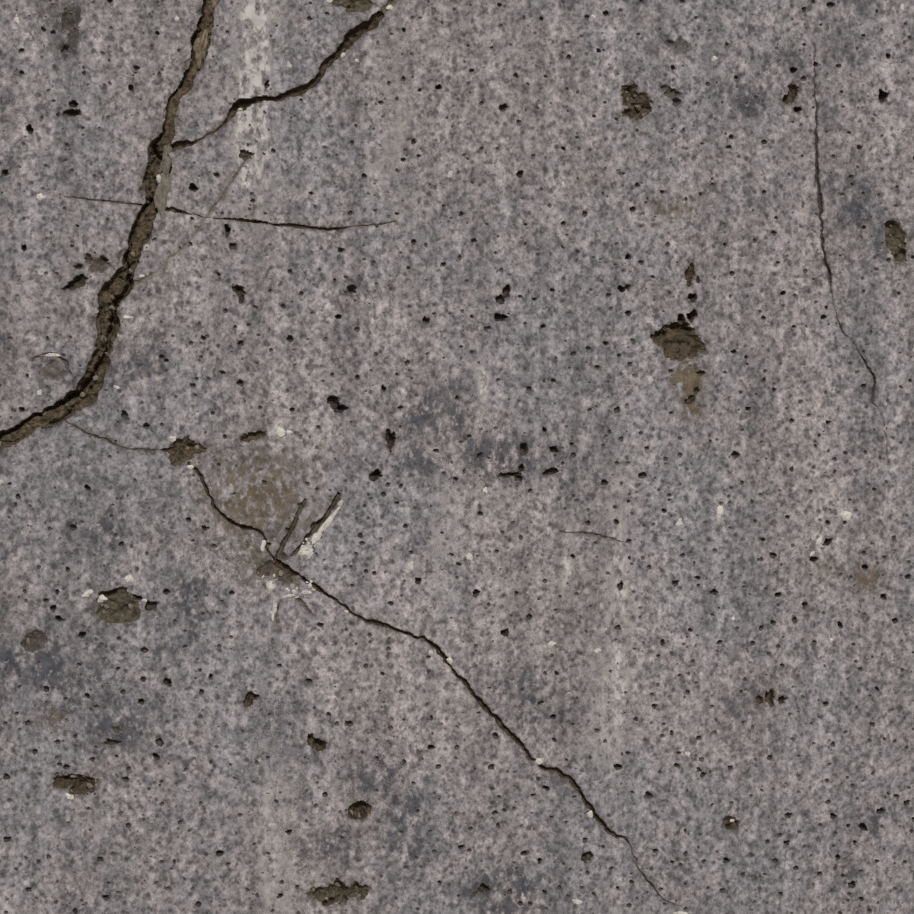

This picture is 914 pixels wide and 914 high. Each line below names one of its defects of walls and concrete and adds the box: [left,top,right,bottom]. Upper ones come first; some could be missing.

crack [0,0,697,914]
crack [809,41,893,467]